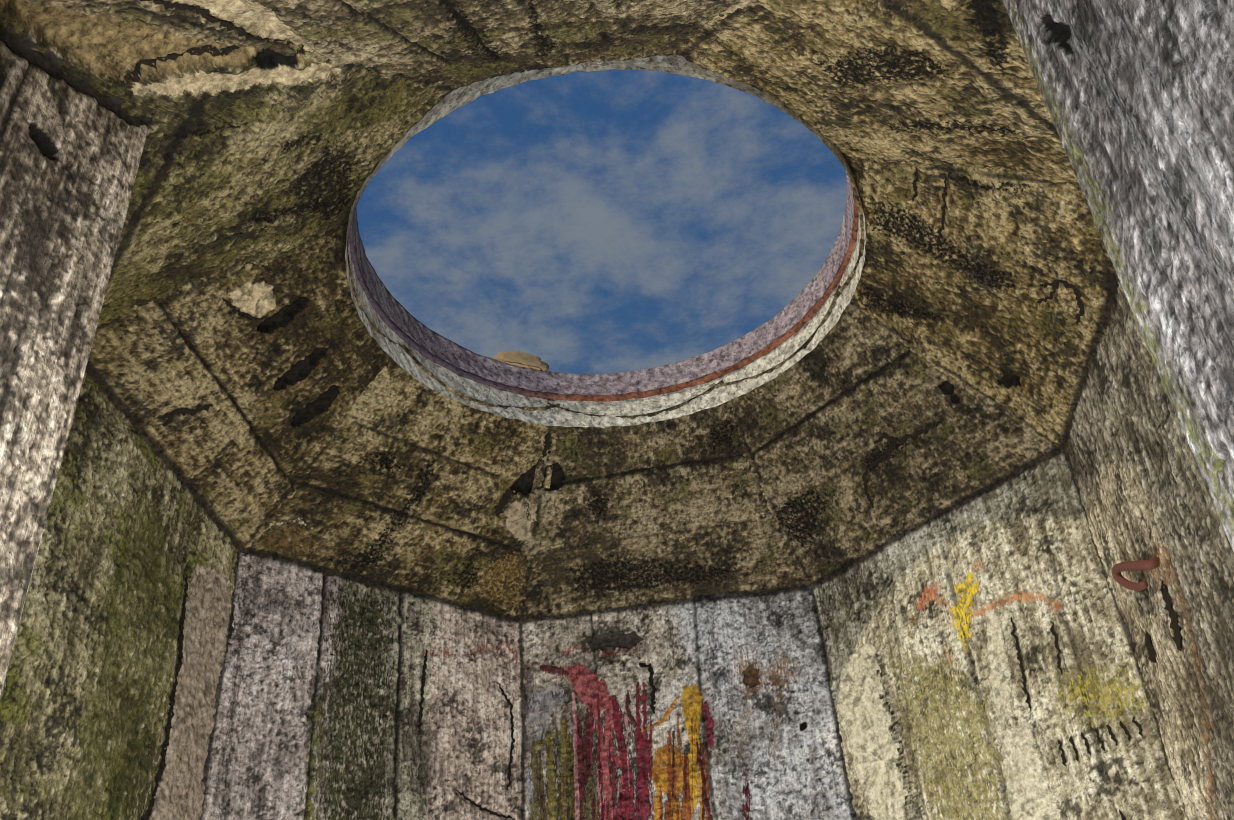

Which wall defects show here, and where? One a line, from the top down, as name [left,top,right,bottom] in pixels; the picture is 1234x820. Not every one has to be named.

peeling [711,0,754,23]
spalling [494,433,565,541]
leakage [54,469,184,820]
leakage [218,447,440,820]
peeling [984,606,1061,820]